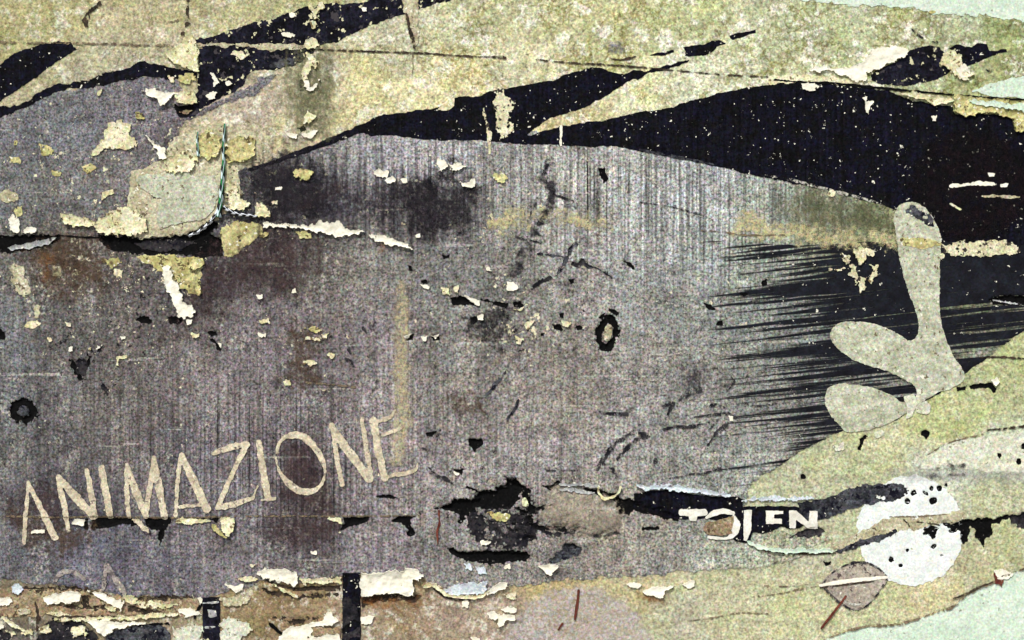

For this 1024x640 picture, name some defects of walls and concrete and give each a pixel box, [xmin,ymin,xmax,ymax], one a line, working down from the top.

peeling [141,36,232,117]
peeling [281,2,325,91]
spalling [482,88,515,154]
peeling [768,45,909,114]
peeling [939,49,975,81]
peeling [900,91,1024,133]
peeling [60,111,420,257]
peeling [437,158,476,188]
peeling [137,254,222,351]
spalling [896,483,947,505]
peeling [0,468,814,640]
peeling [747,527,836,566]